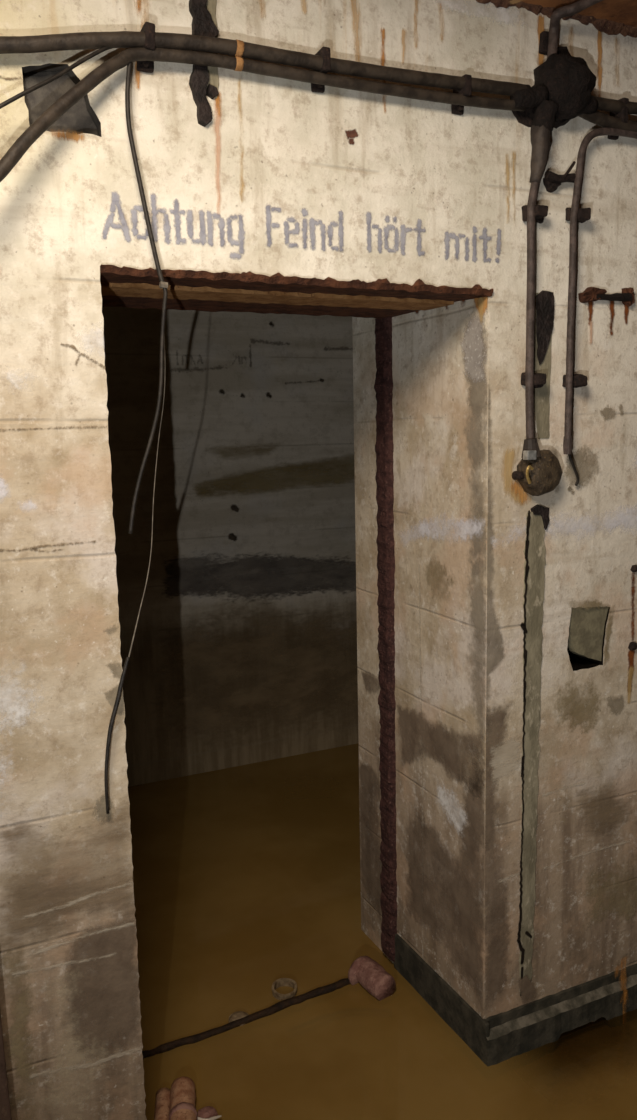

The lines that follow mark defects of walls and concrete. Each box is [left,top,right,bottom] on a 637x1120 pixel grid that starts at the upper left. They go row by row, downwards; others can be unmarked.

rust [234,39,244,71]
rust [476,0,637,96]
rust [345,129,358,145]
rust [610,301,629,335]
water stain [467,334,491,468]
water stain [196,459,355,495]
water stain [164,554,356,601]
rust [627,573,635,703]
water stain [398,478,520,998]
crack [517,511,532,996]
water stain [1,871,132,932]
water stain [9,922,140,1078]